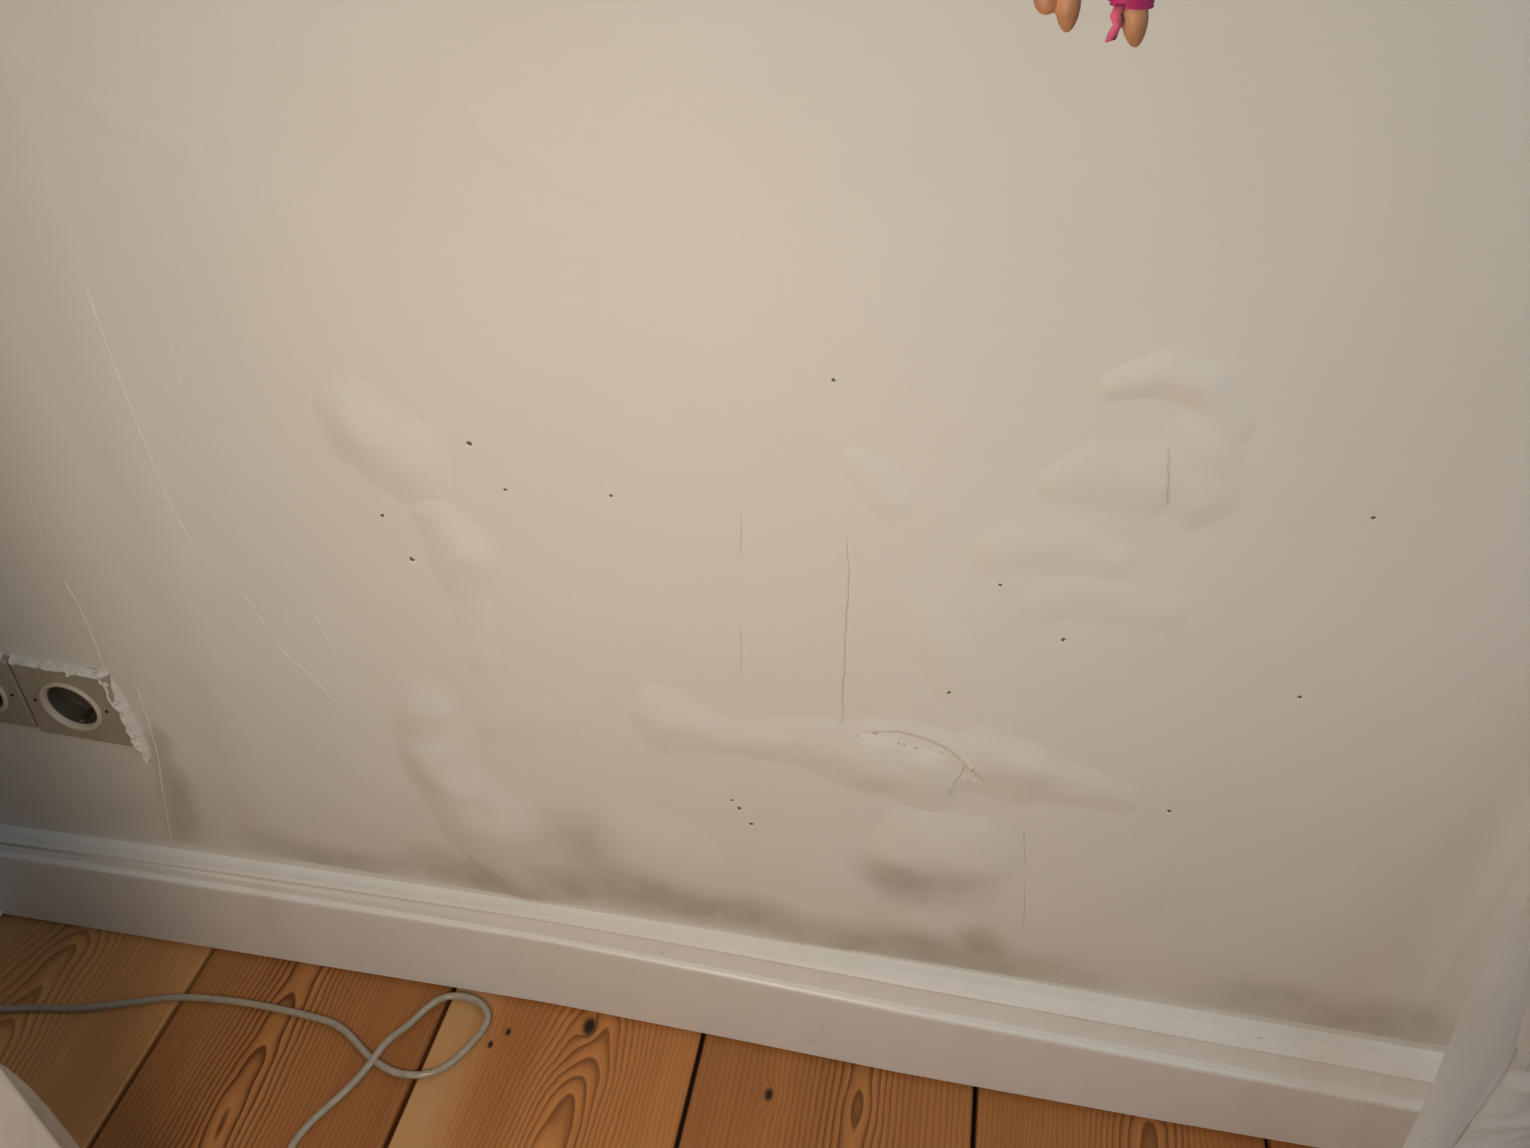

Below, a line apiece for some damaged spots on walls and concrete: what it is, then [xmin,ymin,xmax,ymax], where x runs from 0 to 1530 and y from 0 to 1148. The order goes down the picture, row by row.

peeling [0,653,152,764]
crack [841,538,851,723]